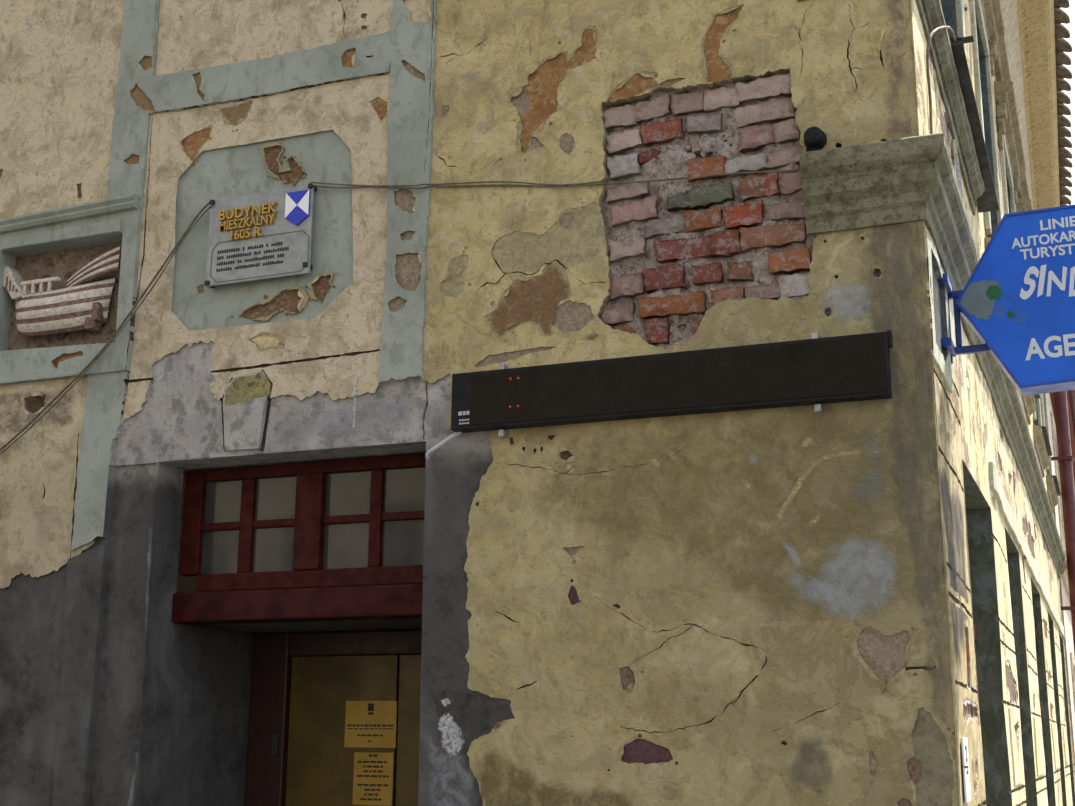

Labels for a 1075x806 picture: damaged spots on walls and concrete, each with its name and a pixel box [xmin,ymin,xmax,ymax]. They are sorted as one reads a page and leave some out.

peeling [260,142,307,186]
flaking render [474,4,817,368]
peeling [231,272,335,351]
peeling [50,351,83,369]
flaking render [23,395,46,414]
peeling [1022,515,1046,585]
crack [595,596,767,733]
flaking render [846,627,936,694]
flaking render [963,624,979,726]
peeling [1005,660,1035,752]
peeling [607,734,678,771]
flaking render [897,704,979,806]